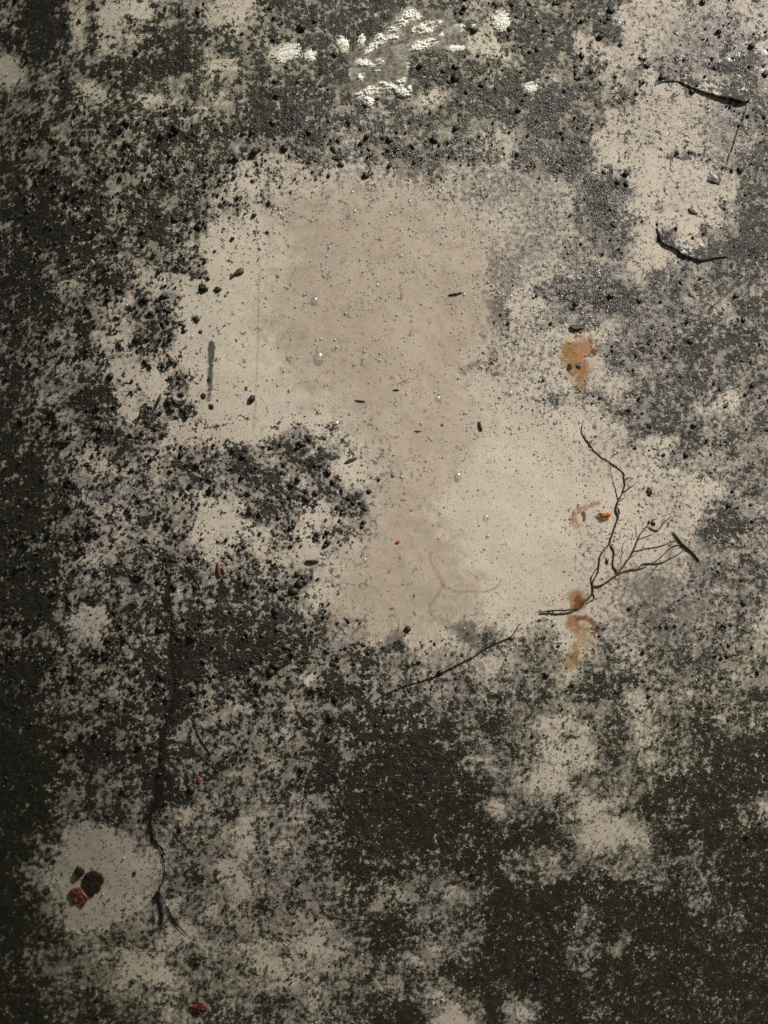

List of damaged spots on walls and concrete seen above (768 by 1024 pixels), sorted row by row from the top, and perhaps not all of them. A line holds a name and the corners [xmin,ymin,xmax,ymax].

crack [727,107,747,163]
leakage [0,0,768,550]
corrosion [562,337,597,390]
corrosion [571,501,612,525]
crack [364,624,520,708]
corrosion [567,590,598,671]
crack [142,564,211,935]
mould [0,433,768,1024]